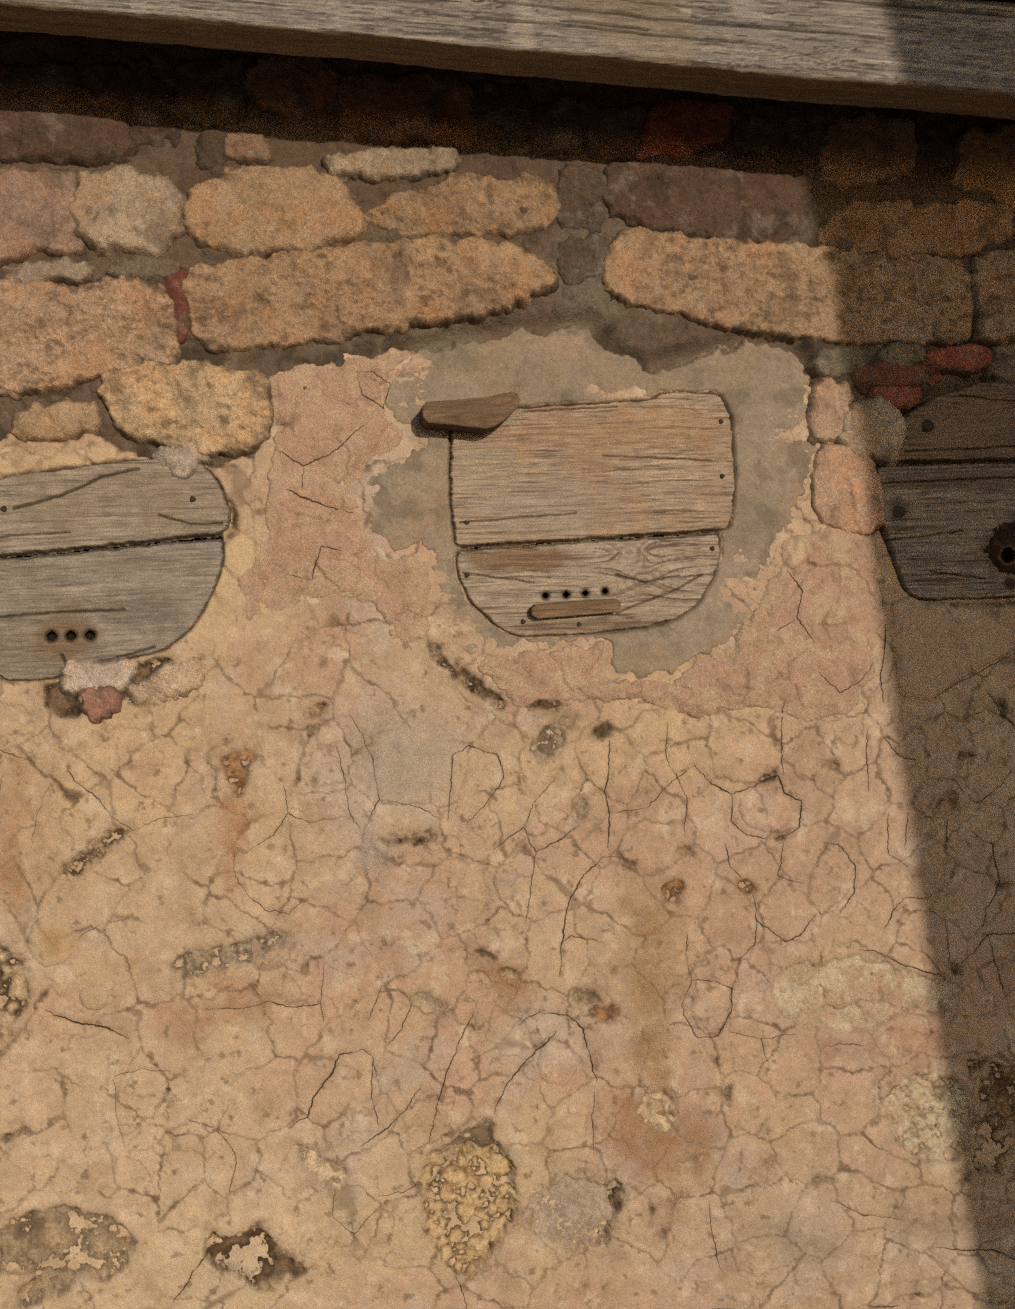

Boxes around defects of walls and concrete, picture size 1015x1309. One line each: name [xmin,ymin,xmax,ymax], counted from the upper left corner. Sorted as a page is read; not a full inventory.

crack [269,370,390,513]
crack [776,570,887,694]
crack [233,715,504,915]
crack [494,701,856,1057]
crack [859,822,1015,1010]
spalling [0,942,32,1041]
crack [46,1010,128,1039]
crack [288,993,474,1145]
crack [494,1010,597,1149]
spalling [0,1203,139,1309]
spalling [202,1219,317,1293]
spalling [415,1116,621,1283]